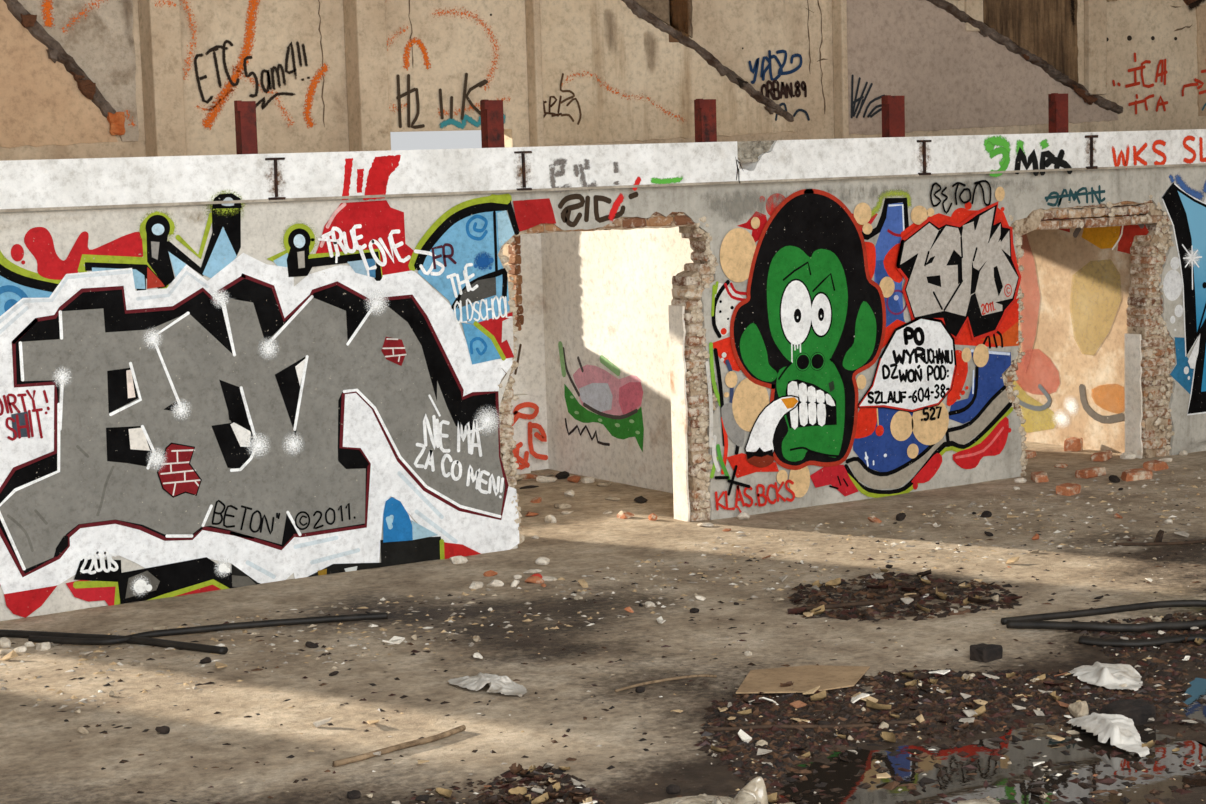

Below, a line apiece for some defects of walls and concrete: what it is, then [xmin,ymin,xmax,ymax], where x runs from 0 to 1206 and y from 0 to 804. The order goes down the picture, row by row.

spalling [926,0,1123,114]
flaking render [498,212,719,545]
flaking render [1000,215,1028,476]
flaking render [1035,195,1176,457]